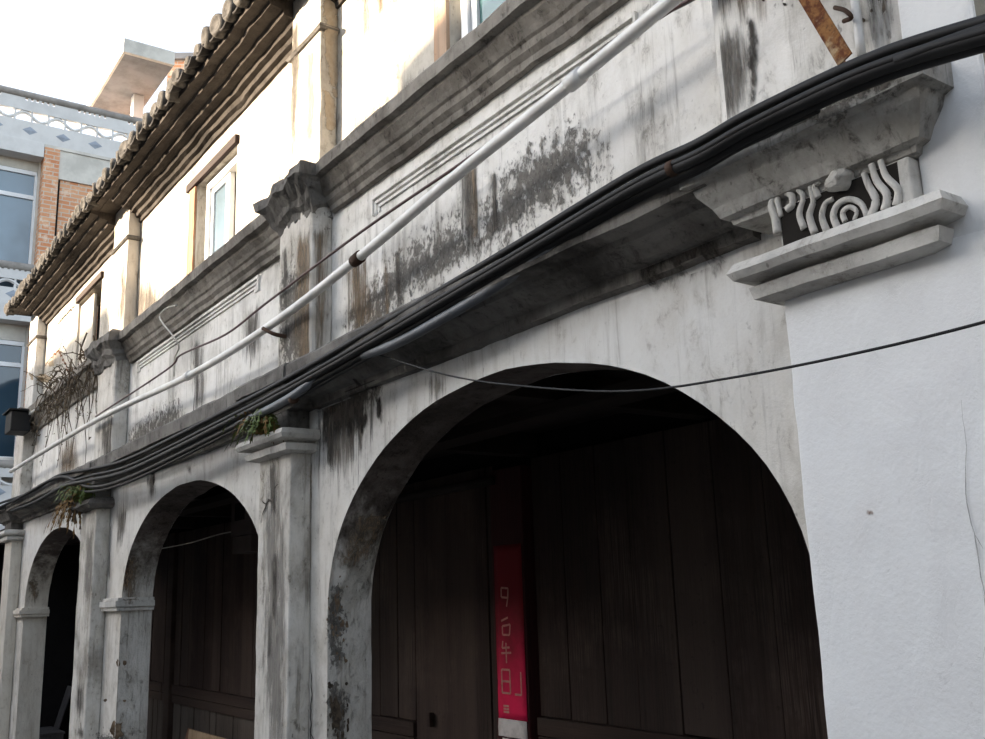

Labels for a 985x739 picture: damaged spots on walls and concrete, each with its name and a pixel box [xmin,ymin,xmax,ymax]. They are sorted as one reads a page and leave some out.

leakage [344,114,612,330]
leakage [640,240,722,286]
leakage [313,379,381,475]
crack [961,400,985,603]
flaking render [326,576,348,669]
spalling [110,721,124,739]
spalling [327,681,349,739]